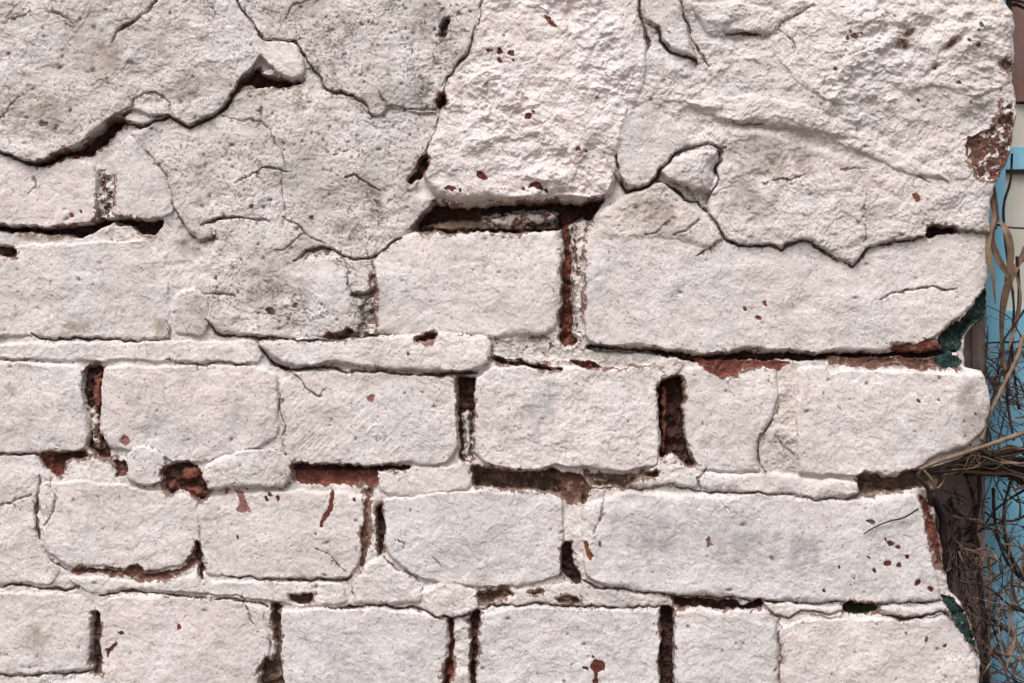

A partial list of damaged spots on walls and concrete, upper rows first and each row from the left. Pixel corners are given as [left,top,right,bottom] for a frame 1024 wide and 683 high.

crack [207,0,483,158]
spalling [965,101,1014,181]
crack [616,144,924,268]
crack [0,70,476,444]
crack [884,286,956,298]
spalling [688,356,790,378]
peeling [225,489,250,513]
peeling [315,490,334,535]
spalling [552,469,589,504]
crack [593,420,860,535]
spalling [920,496,944,571]
peeling [582,655,605,683]